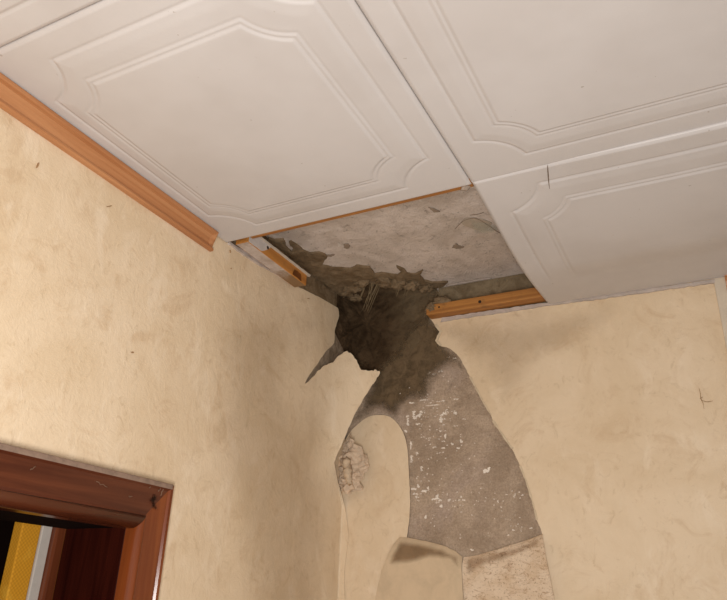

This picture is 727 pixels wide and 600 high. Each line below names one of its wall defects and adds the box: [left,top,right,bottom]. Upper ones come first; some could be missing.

flaking render [262,236,542,561]
leakage [366,318,451,412]